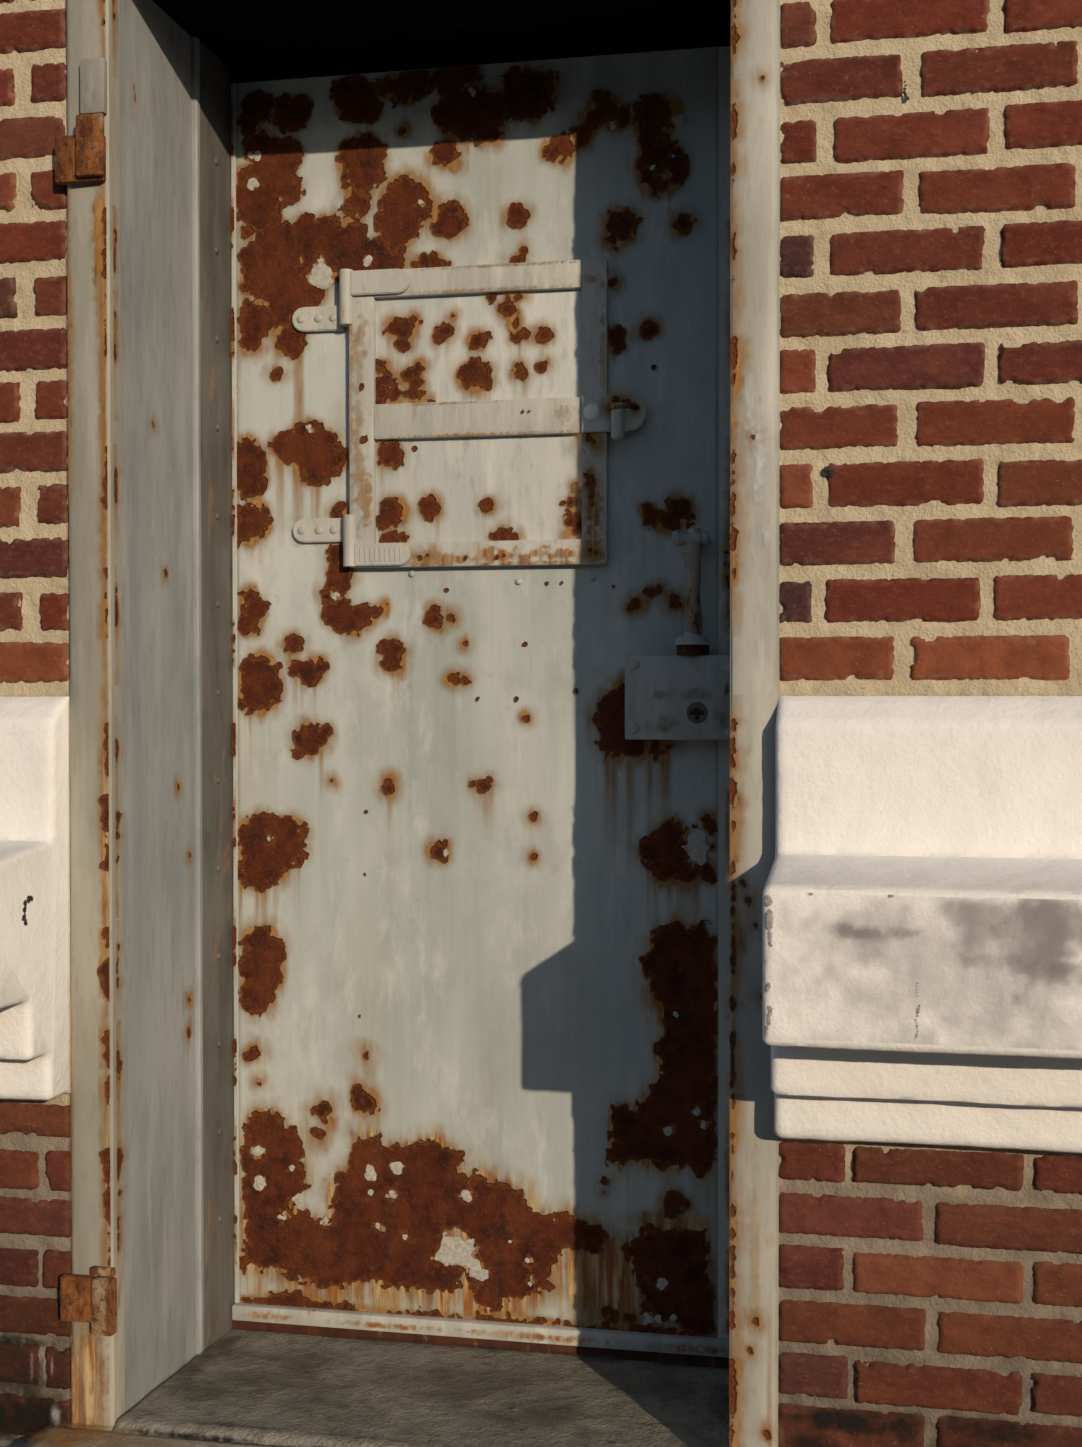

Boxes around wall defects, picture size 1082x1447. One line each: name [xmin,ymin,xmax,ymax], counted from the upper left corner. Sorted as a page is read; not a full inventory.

rust [540,90,697,237]
rust [230,65,604,566]
rust [92,196,122,1001]
rust [231,584,330,756]
rust [319,542,407,678]
rust [423,588,469,651]
rust [589,674,673,800]
rust [638,493,696,535]
rust [724,336,759,643]
water stain [960,899,1082,981]
rust [99,1027,124,1266]
rust [232,713,763,1447]